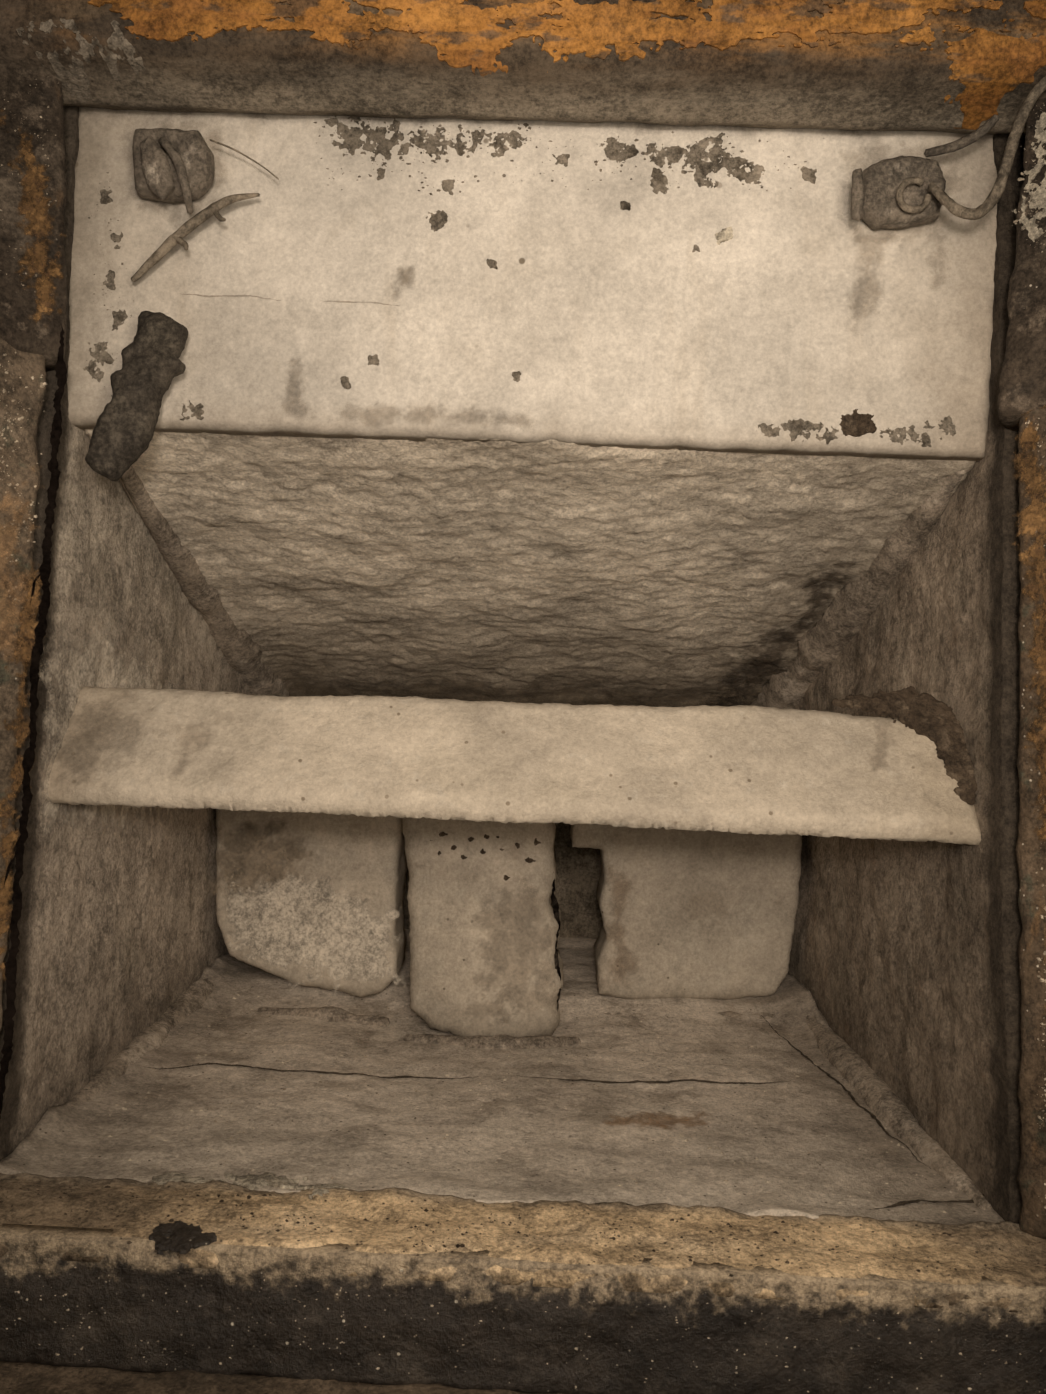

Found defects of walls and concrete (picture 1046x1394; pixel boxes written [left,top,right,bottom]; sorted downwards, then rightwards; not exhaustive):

spalling [313,116,574,232]
spalling [587,131,817,194]
spalling [340,376,351,389]
spalling [368,354,379,366]
spalling [758,409,956,447]
rust [1013,405,1046,840]
crack [0,324,67,1119]
spalling [832,686,977,805]
crack [147,1063,478,1079]
crack [516,1015,985,1210]